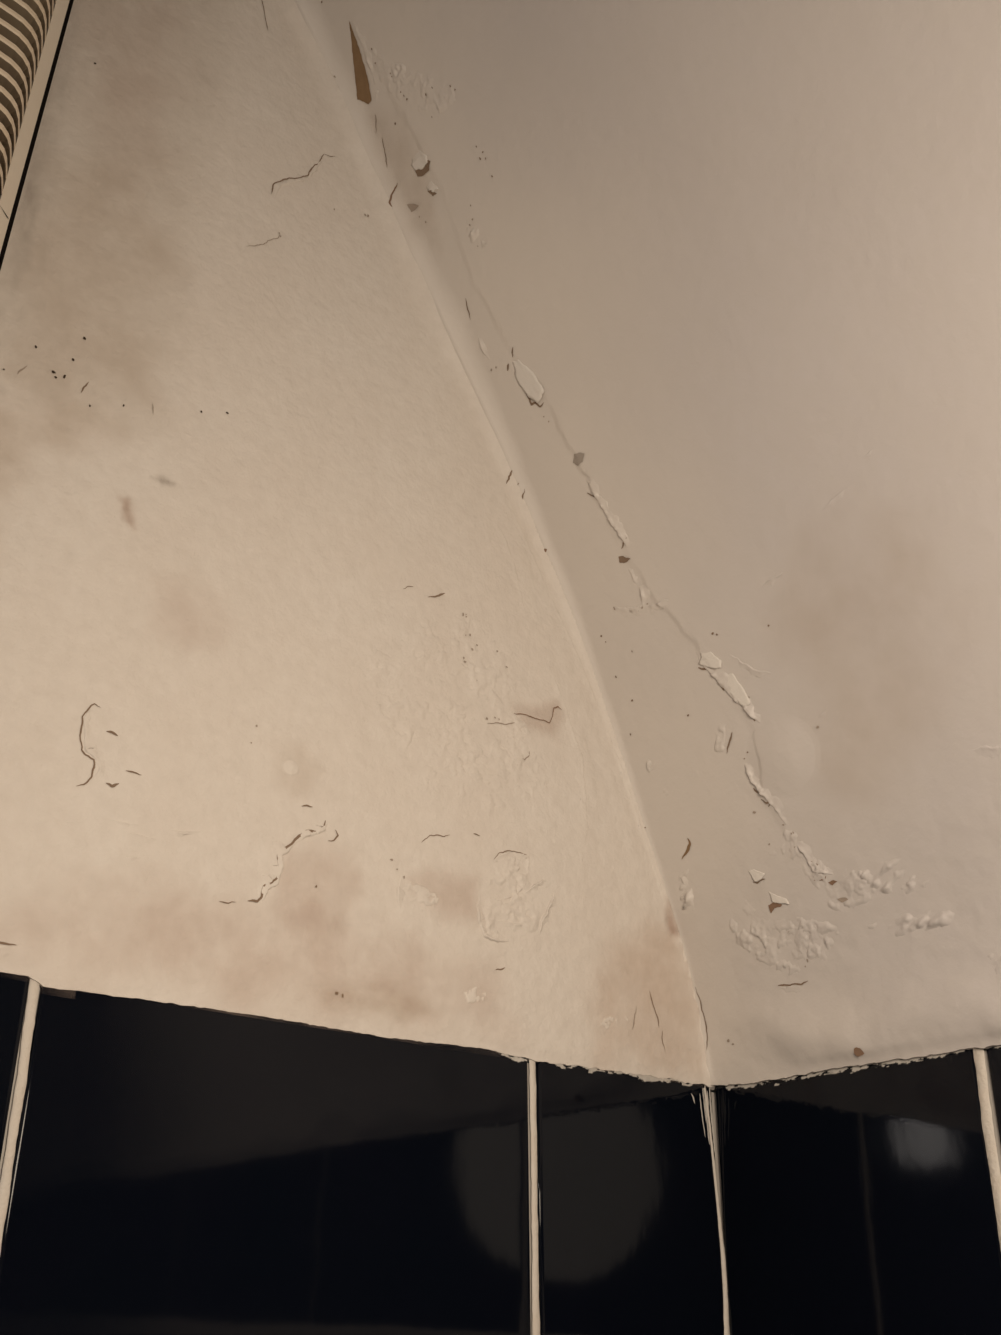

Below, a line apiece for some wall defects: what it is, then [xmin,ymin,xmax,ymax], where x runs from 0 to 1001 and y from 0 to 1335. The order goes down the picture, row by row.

crack [272,154,333,197]
spalling [411,150,438,196]
peeling [490,348,549,422]
peeling [573,453,632,563]
peeling [695,650,771,723]
peeling [681,839,691,890]